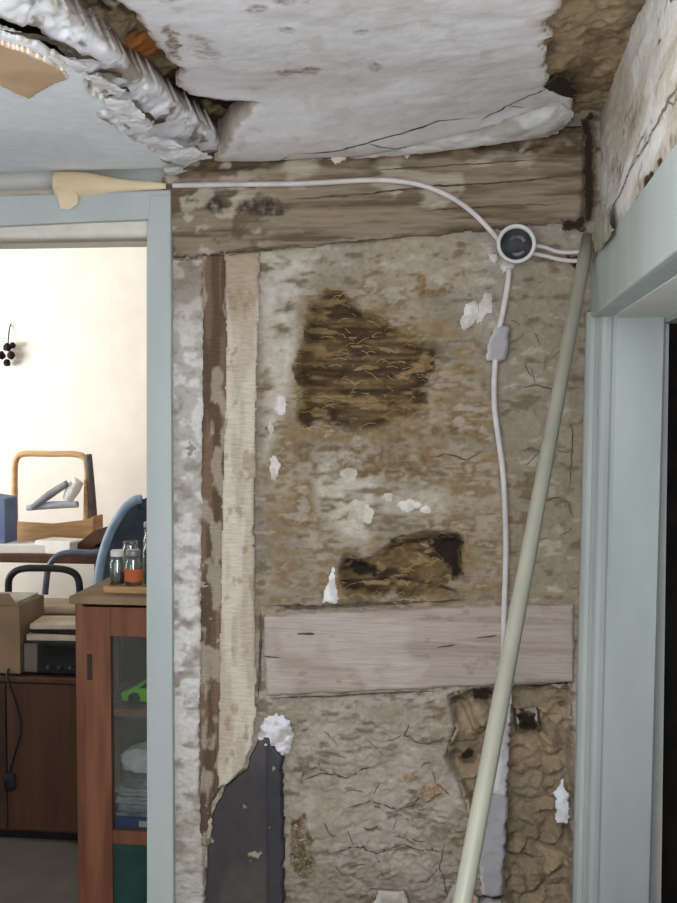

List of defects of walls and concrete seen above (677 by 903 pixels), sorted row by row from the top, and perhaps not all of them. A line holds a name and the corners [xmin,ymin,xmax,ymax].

peeling [56,54,213,176]
spalling [79,0,235,122]
crack [266,86,580,212]
spalling [543,0,646,253]
crack [605,84,677,216]
crack [235,236,410,252]
spalling [268,288,440,434]
spalling [323,530,470,604]
peeling [258,713,295,756]
crack [293,725,449,895]
spalling [445,685,494,815]
spalling [503,683,576,903]